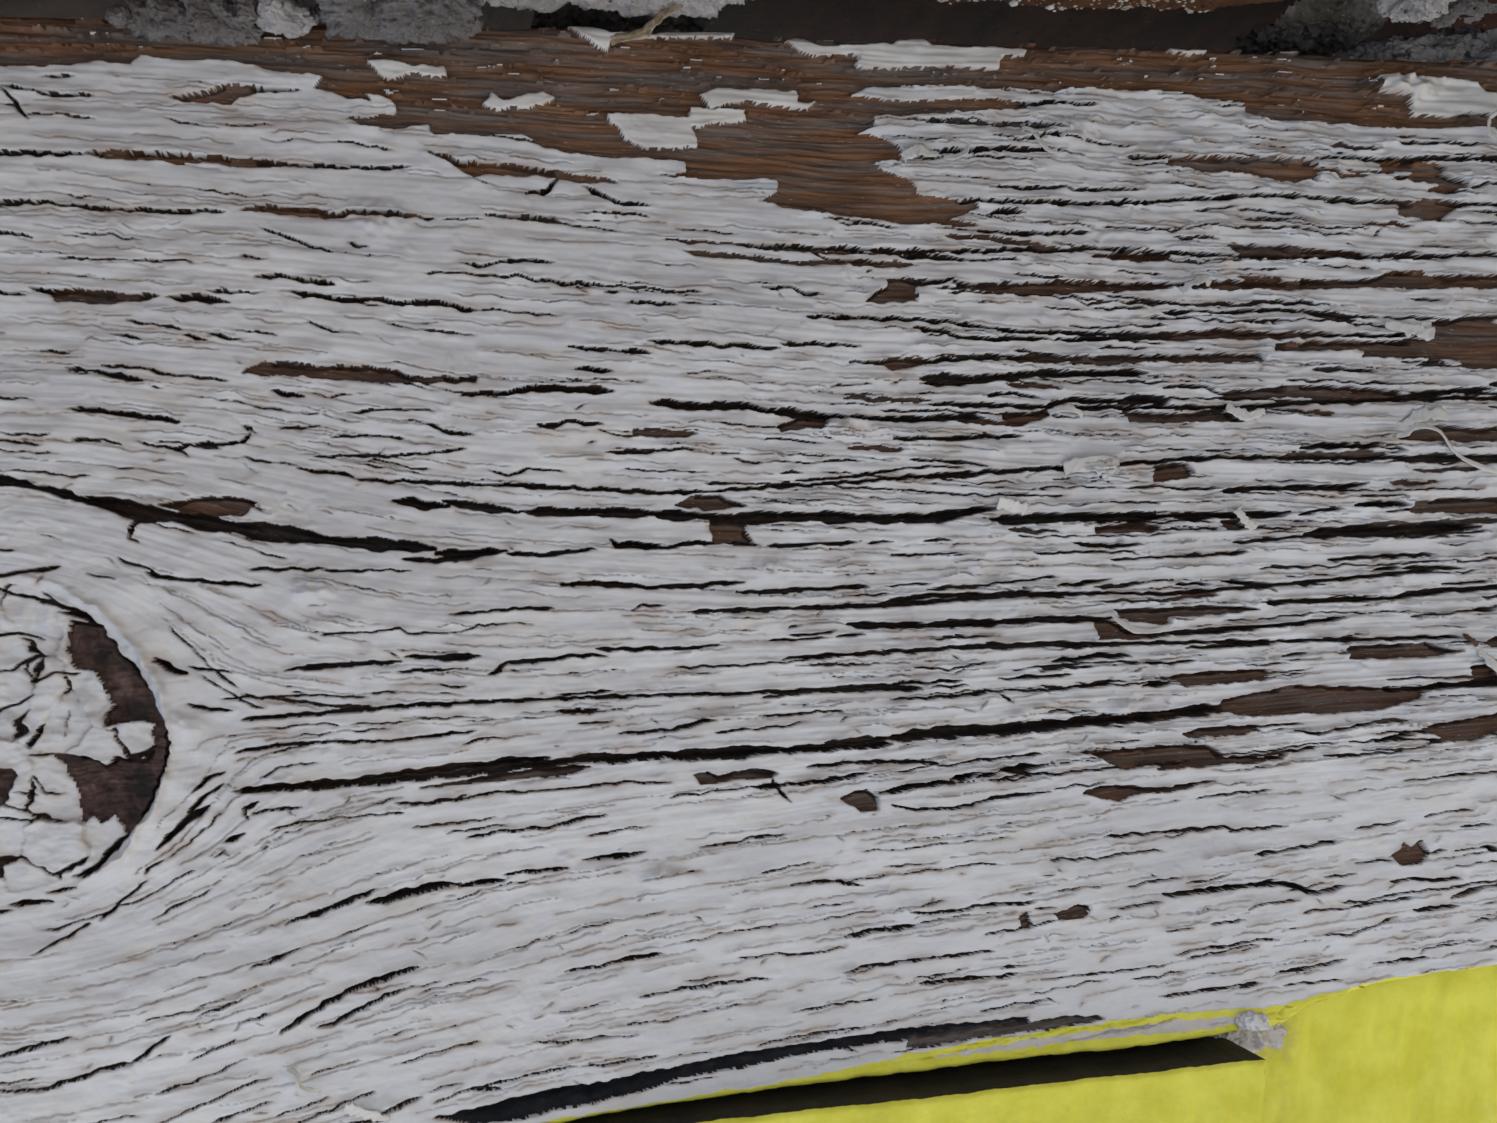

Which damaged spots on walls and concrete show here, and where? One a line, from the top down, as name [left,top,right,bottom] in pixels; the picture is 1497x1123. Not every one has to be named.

crack [0,73,102,158]
peeling [0,16,1497,225]
peeling [866,270,1497,304]
peeling [1002,314,1497,370]
crack [0,88,1497,953]
peeling [1091,605,1256,640]
peeling [1081,669,1423,802]
peeling [1419,712,1497,744]
crack [516,913,661,972]
crack [640,825,1283,1060]
crack [1110,845,1497,986]
crack [0,947,713,1123]